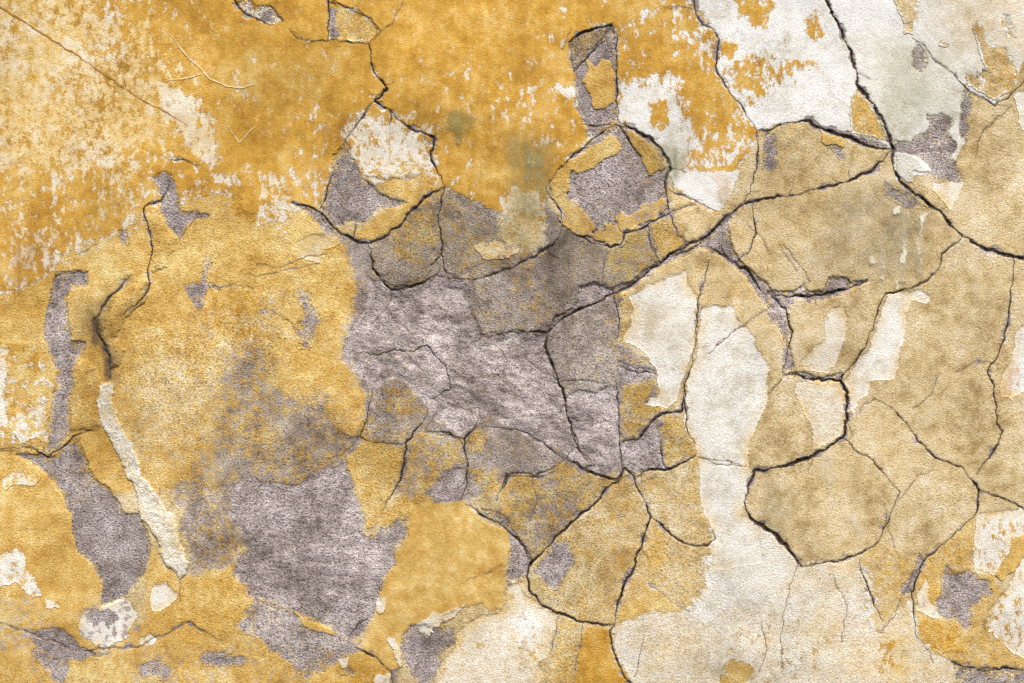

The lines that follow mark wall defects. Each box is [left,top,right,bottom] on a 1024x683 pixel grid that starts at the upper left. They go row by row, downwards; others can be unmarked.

flaking render [0,271,156,683]
crack [93,159,208,375]
peeling [150,581,177,612]
flaking render [199,650,249,667]
flaking render [229,457,409,681]
flaking render [291,141,406,263]
flaking render [547,24,670,247]
crack [215,0,1024,683]
flaking render [340,210,930,572]
peeling [894,0,928,75]
flaking render [820,14,1024,211]
peeling [900,507,1024,683]